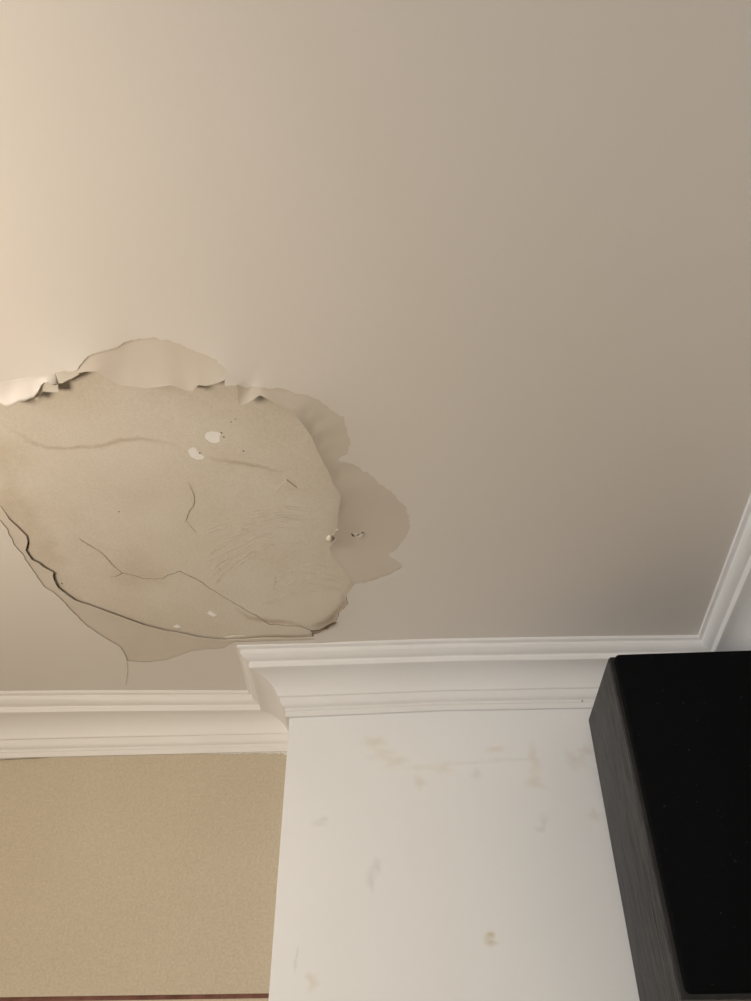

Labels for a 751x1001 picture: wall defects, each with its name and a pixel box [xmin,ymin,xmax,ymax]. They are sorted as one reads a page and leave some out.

peeling [0,337,410,662]